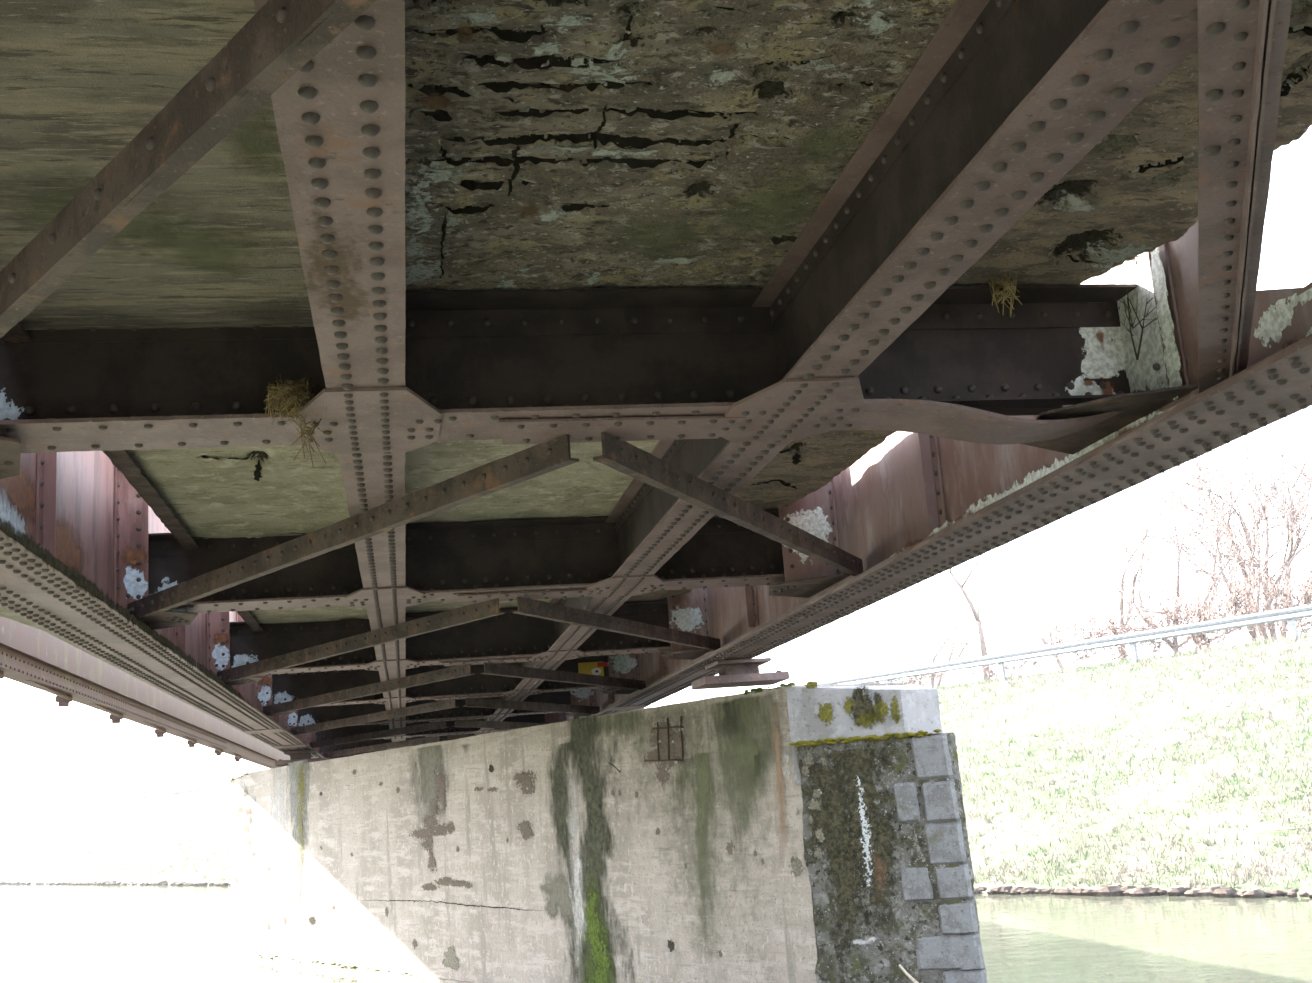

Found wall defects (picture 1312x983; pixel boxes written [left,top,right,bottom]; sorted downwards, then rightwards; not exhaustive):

crack [766,55,873,87]
crack [405,0,793,278]
spalling [1035,179,1100,210]
spalling [1049,228,1123,265]
leakage [413,745,444,816]
leakage [541,712,691,983]
leakage [676,697,790,911]
leakage [853,775,874,891]